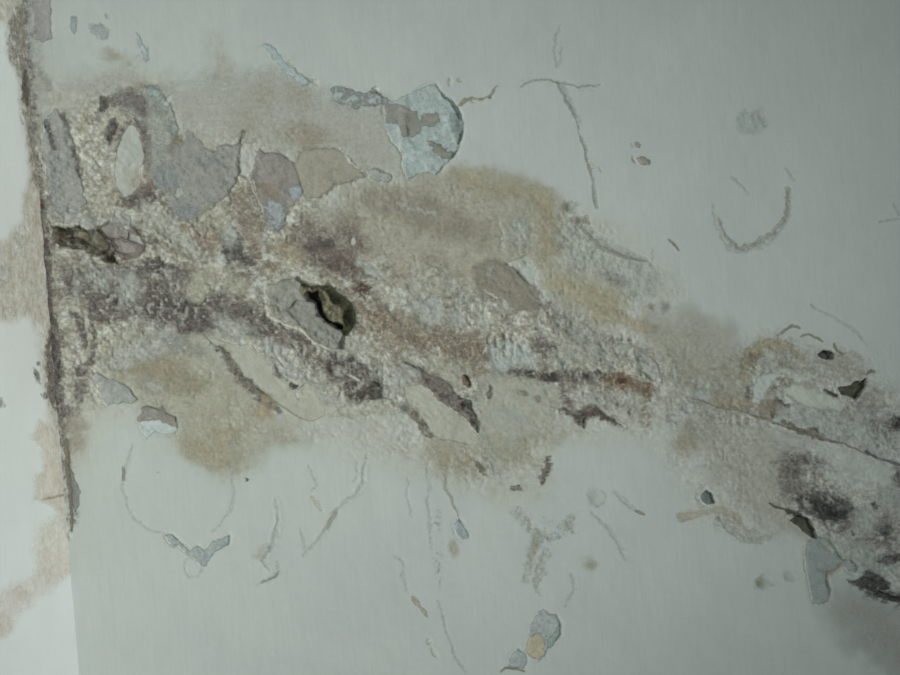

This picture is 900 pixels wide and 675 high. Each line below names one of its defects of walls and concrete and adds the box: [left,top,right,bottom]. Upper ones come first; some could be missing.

spalling [42,109,145,263]
water stain [0,0,463,632]
spalling [114,85,392,234]
hole [260,271,356,351]
peeling [331,84,464,178]
water stain [297,169,655,329]
crack [533,30,601,204]
water stain [488,275,683,400]
crack [717,174,791,252]
crack [45,420,81,541]
crack [710,404,900,466]
water stain [774,453,900,578]